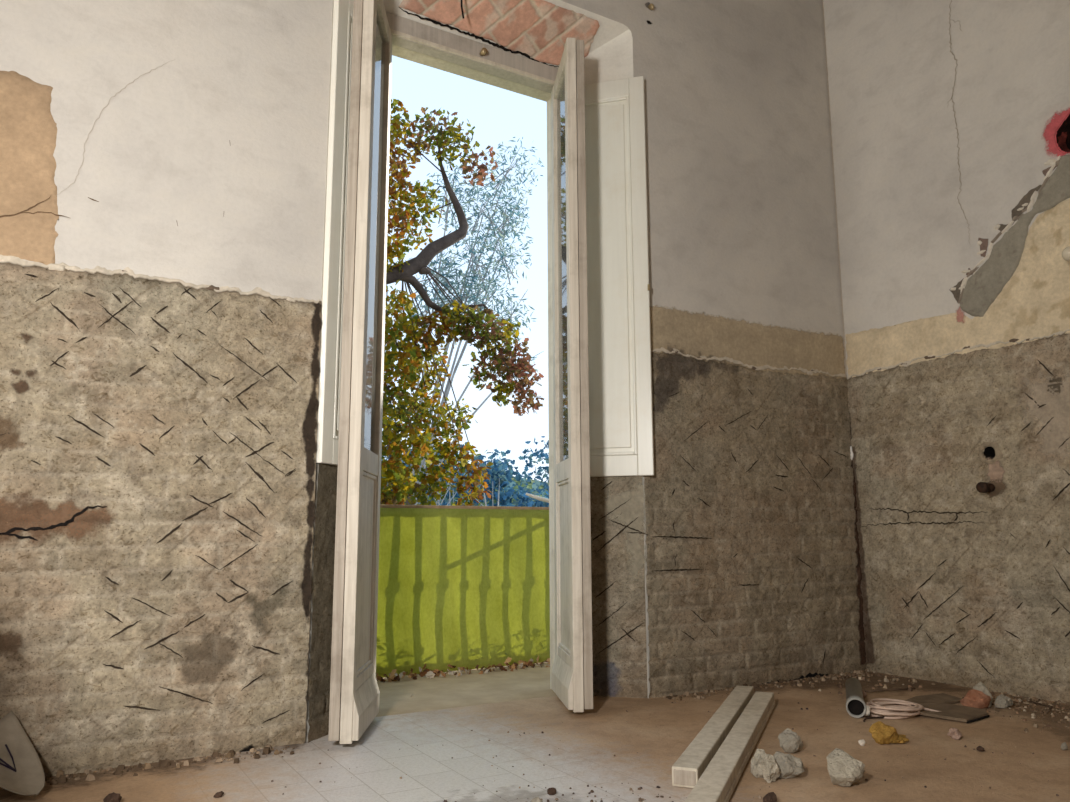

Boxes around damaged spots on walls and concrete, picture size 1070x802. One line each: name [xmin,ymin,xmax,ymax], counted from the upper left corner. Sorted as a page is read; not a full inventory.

flaking render [399,0,600,67]
crack [0,60,173,218]
crack [947,0,970,243]
peeling [650,108,1070,380]
peeling [0,71,323,622]
crack [25,274,297,669]
crack [862,508,987,527]
crack [1021,393,1070,500]
crack [125,686,213,710]
crack [241,645,280,691]
crack [902,559,1023,678]
crack [1045,539,1070,637]